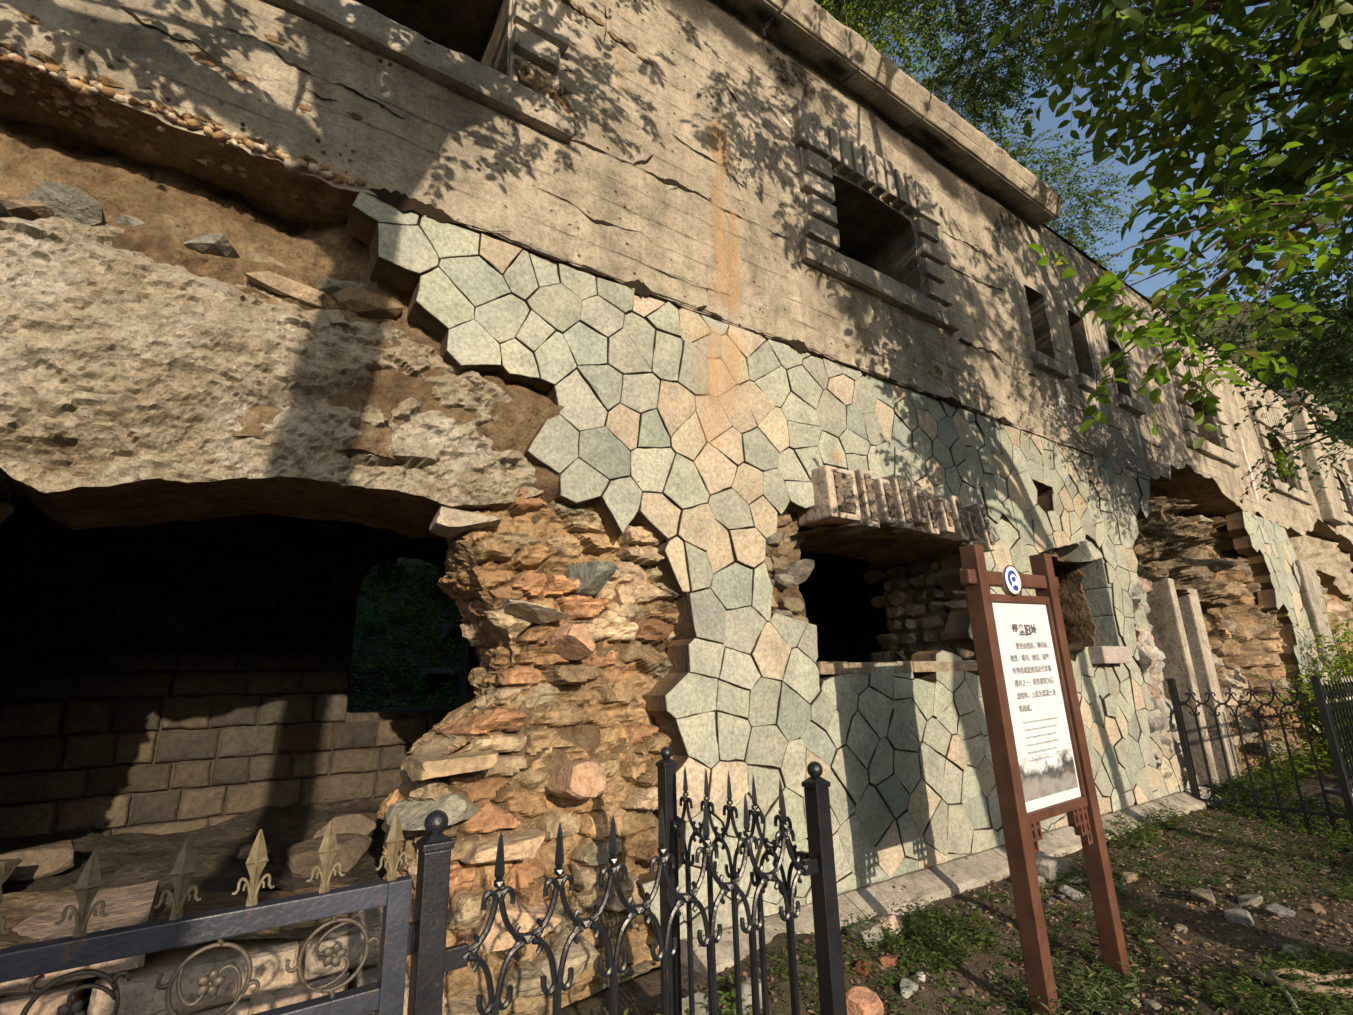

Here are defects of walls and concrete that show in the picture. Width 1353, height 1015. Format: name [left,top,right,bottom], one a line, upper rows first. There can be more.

crack [119,1,407,119]
spalling [1289,533,1353,603]
spalling [1131,493,1248,790]